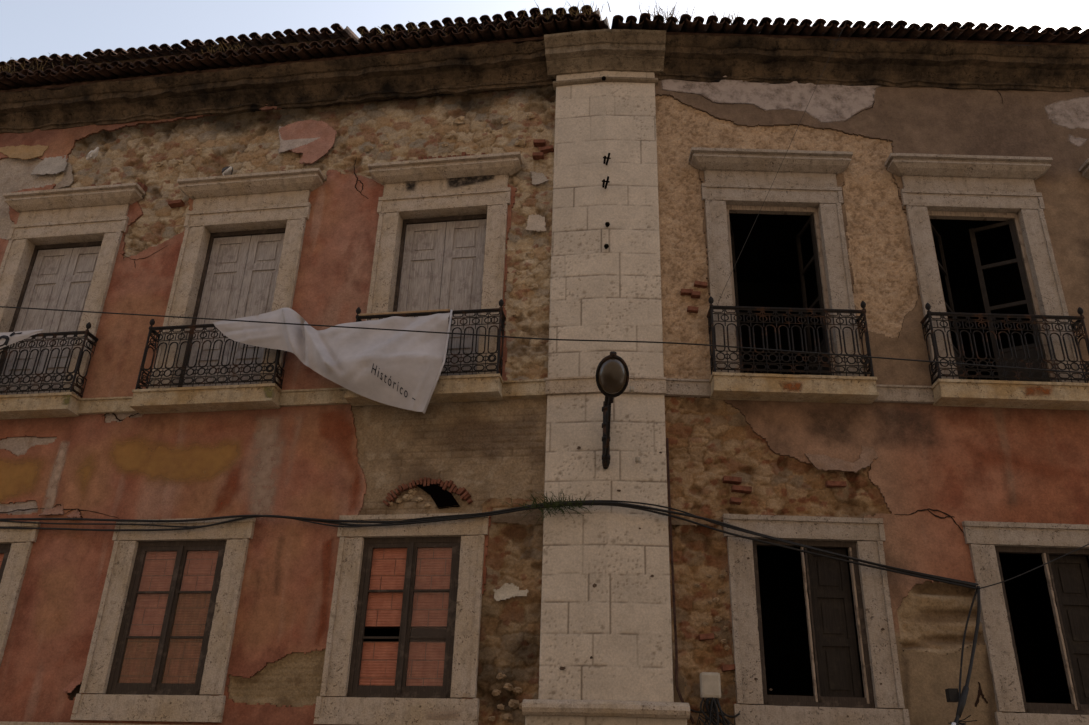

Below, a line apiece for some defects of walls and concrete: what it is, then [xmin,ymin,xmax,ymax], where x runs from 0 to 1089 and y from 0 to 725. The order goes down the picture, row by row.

peeling [278,126,320,153]
flaking render [0,145,74,240]
peeling [525,214,546,232]
flaking render [655,76,919,379]
peeling [493,583,529,601]
flaking render [897,581,985,655]
flaking render [227,649,326,707]